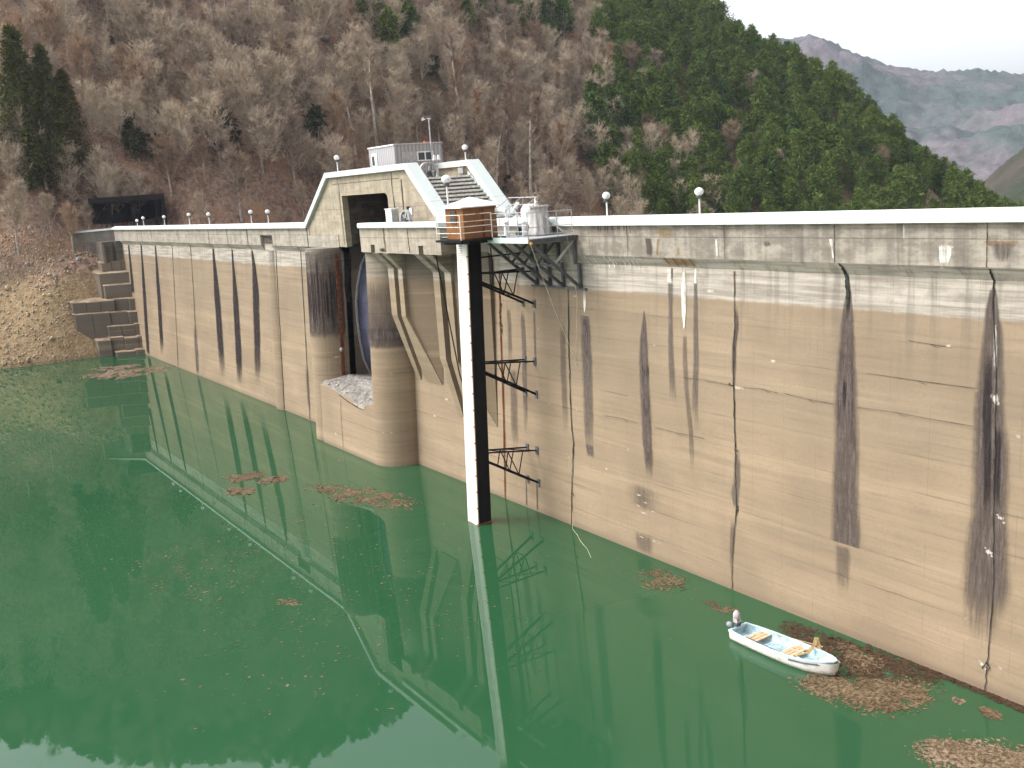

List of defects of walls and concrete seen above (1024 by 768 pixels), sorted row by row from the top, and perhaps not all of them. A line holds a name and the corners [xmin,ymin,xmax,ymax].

damp [212,249,242,375]
damp [251,250,260,372]
damp [305,250,351,336]
damp [574,290,593,455]
damp [639,311,652,466]
damp [667,268,698,416]
crack [683,225,832,590]
damp [834,275,859,565]
crack [868,225,997,691]
damp [966,289,1008,622]